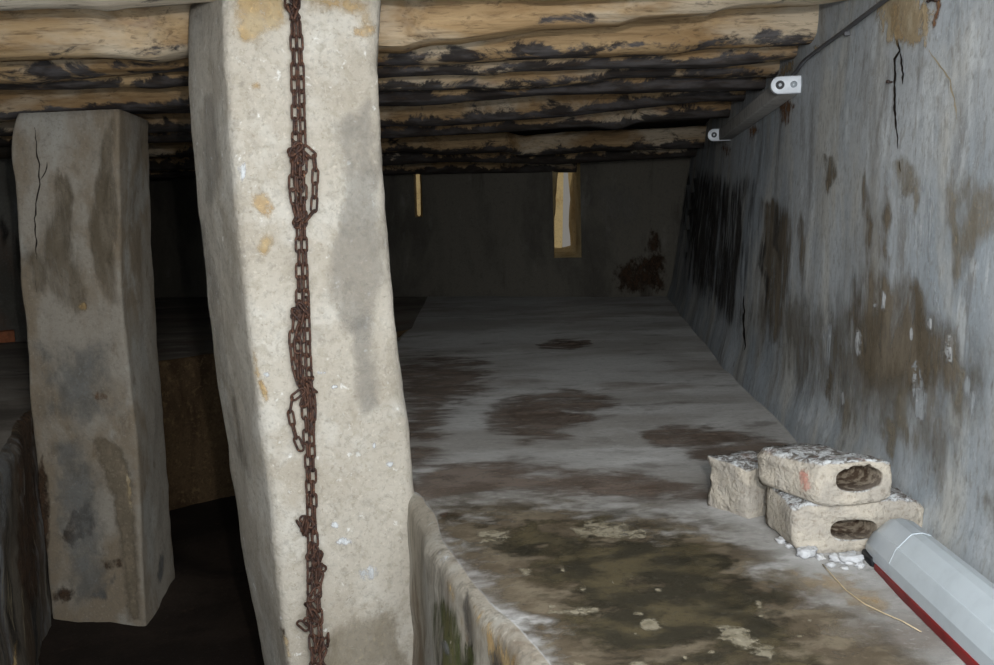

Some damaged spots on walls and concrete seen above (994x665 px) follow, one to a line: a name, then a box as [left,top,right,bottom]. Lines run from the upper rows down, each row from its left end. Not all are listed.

crack [893,34,904,172]
crack [929,51,957,118]
crack [34,127,47,257]
damp [30,180,82,310]
damp [90,135,116,295]
rust [615,231,665,292]
damp [682,172,753,323]
damp [824,156,836,193]
damp [862,176,891,247]
damp [536,339,593,350]
damp [759,199,978,466]
damp [400,355,924,665]